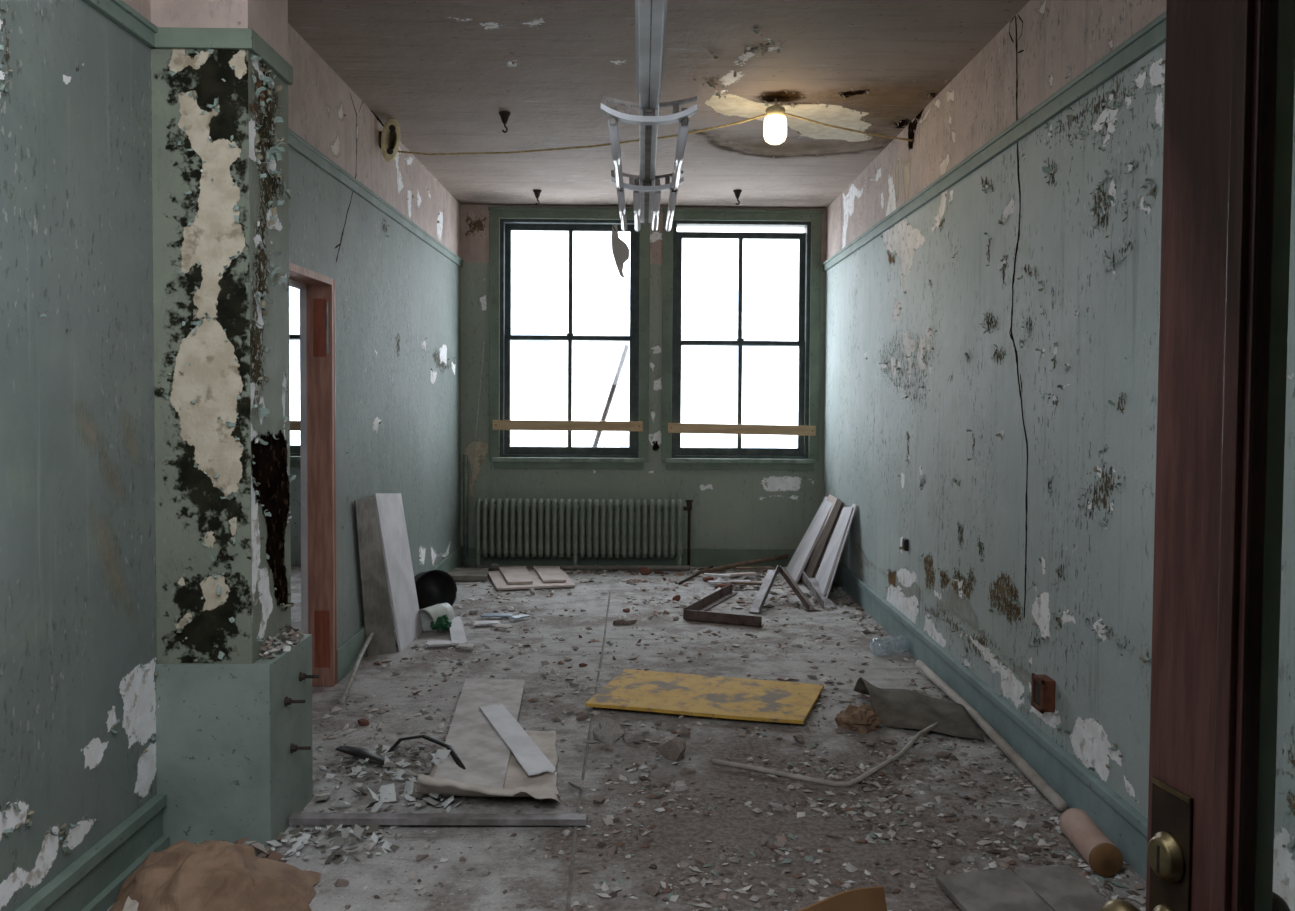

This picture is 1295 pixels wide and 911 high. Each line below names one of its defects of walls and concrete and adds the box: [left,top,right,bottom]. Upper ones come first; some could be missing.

peeling [168,48,214,76]
peeling [229,49,282,93]
water stain [695,130,830,158]
peeling [693,30,873,142]
peeling [1042,58,1165,183]
peeling [842,86,956,401]
peeling [162,90,296,644]
crack [1009,15,1028,618]
peeling [81,657,159,798]
peeling [884,537,1139,803]
peeling [0,815,98,910]
peeling [1273,826,1295,911]